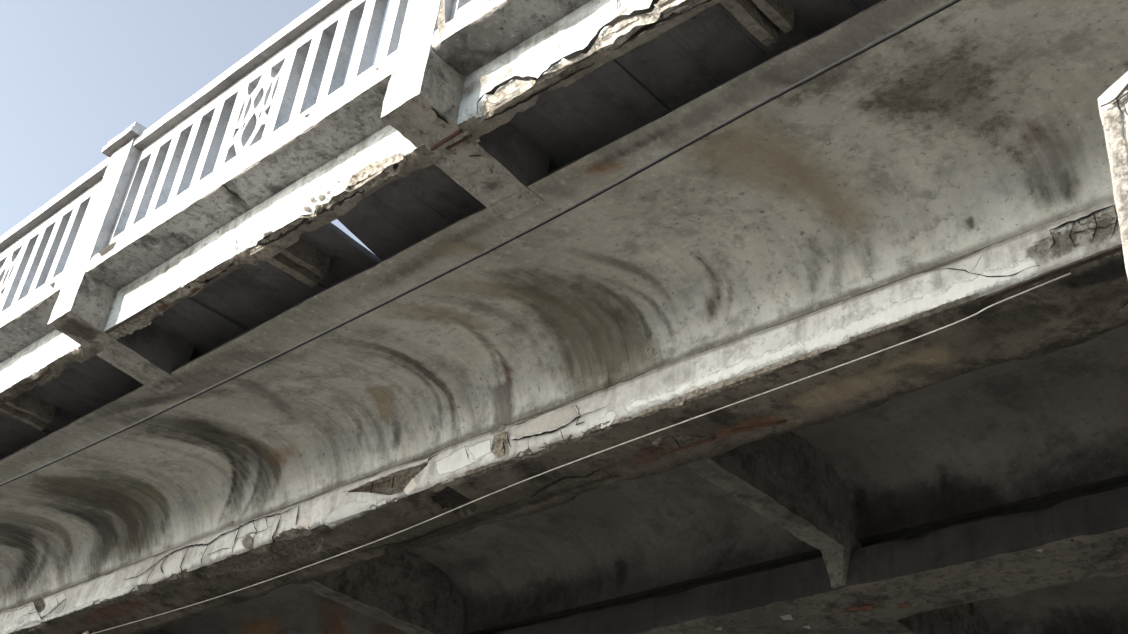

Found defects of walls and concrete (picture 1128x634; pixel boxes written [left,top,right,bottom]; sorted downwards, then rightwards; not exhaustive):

spalling [477,0,712,121]
water stain [868,51,993,113]
spalling [108,152,406,339]
crack [937,205,1119,277]
peeling [324,89,1128,527]
water stain [166,421,281,504]
crack [507,402,611,455]
water stain [0,526,35,581]
water stain [44,478,167,565]
spalling [0,517,321,634]
crack [124,506,299,580]
crack [362,469,627,553]